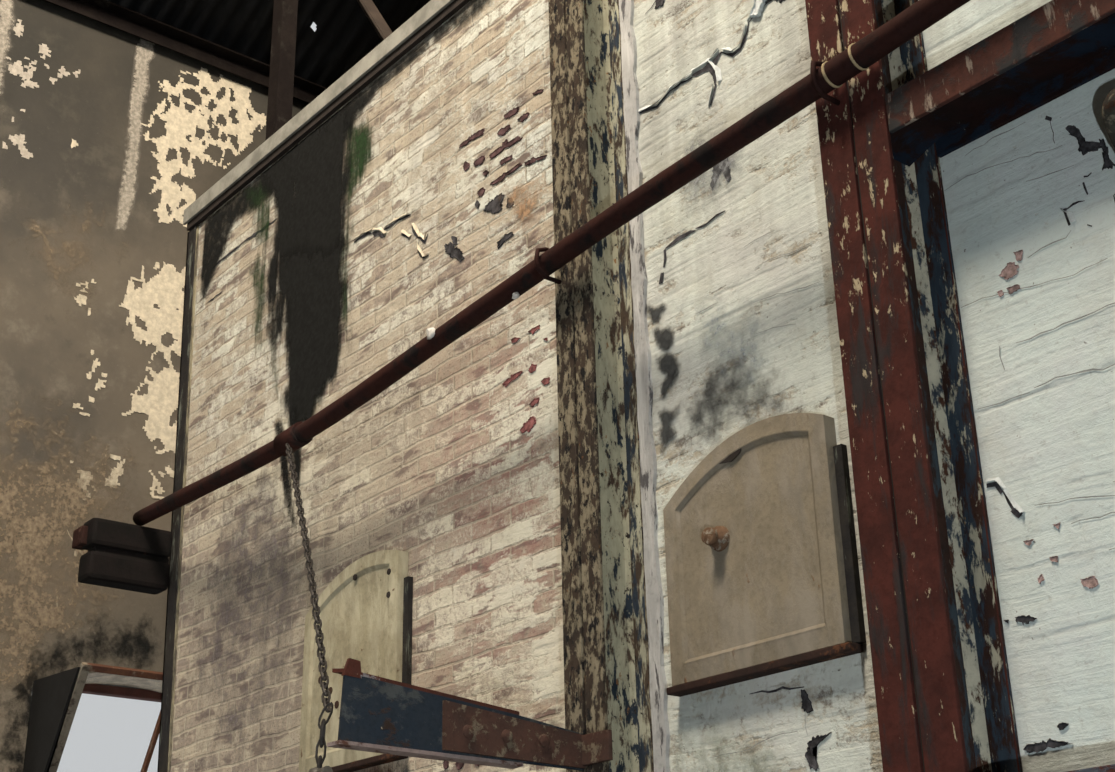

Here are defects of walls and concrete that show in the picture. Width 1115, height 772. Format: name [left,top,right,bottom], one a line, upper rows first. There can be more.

peeling [0,0,81,93]
crack [639,0,772,114]
peeling [2,109,33,159]
peeling [116,38,266,230]
spalling [459,107,547,214]
damp [251,107,371,435]
peeling [72,350,107,417]
peeling [119,261,186,500]
flaking render [502,364,550,433]
damp [691,349,781,436]
peeling [70,454,125,500]
spalling [805,732,831,771]